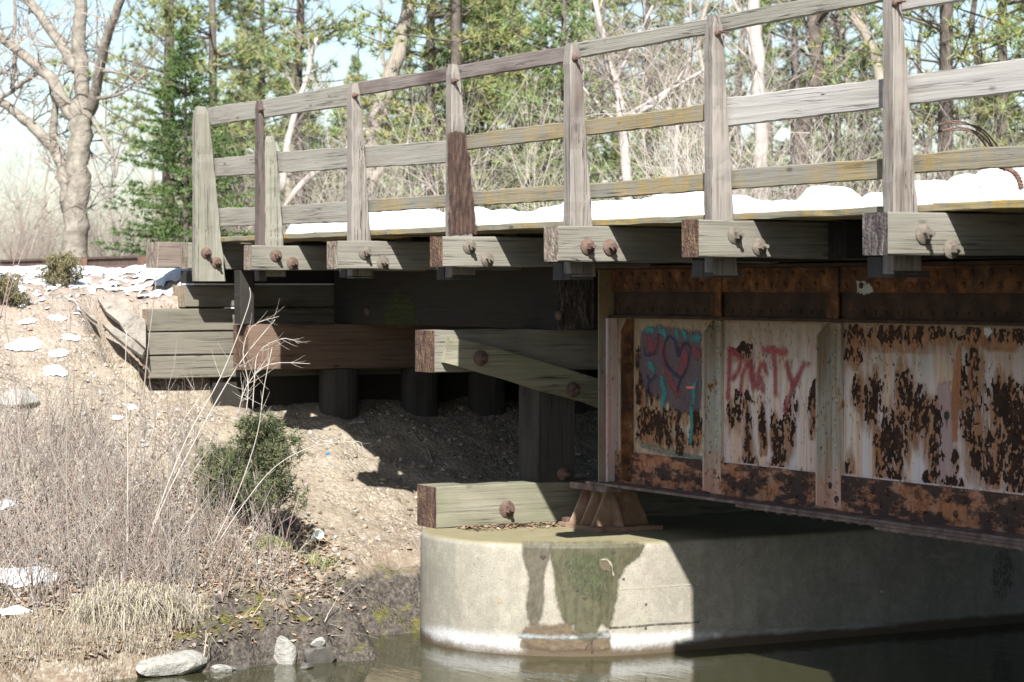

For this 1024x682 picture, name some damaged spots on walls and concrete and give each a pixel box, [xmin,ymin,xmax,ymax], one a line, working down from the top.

corrosion [732,341,754,361]
corrosion [635,345,703,456]
corrosion [726,379,816,467]
corrosion [844,324,1024,493]
corrosion [940,501,967,523]
damp [523,542,552,625]